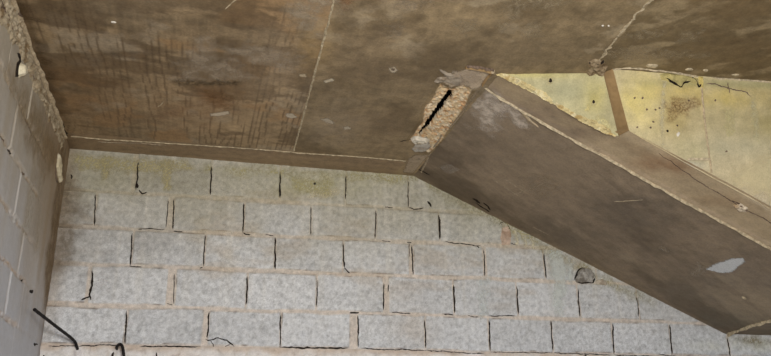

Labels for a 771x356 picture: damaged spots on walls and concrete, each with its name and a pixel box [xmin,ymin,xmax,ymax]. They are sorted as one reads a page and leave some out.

spalling [0,0,65,183]
spalling [400,65,616,155]
crack [708,83,750,96]
crack [659,153,771,223]